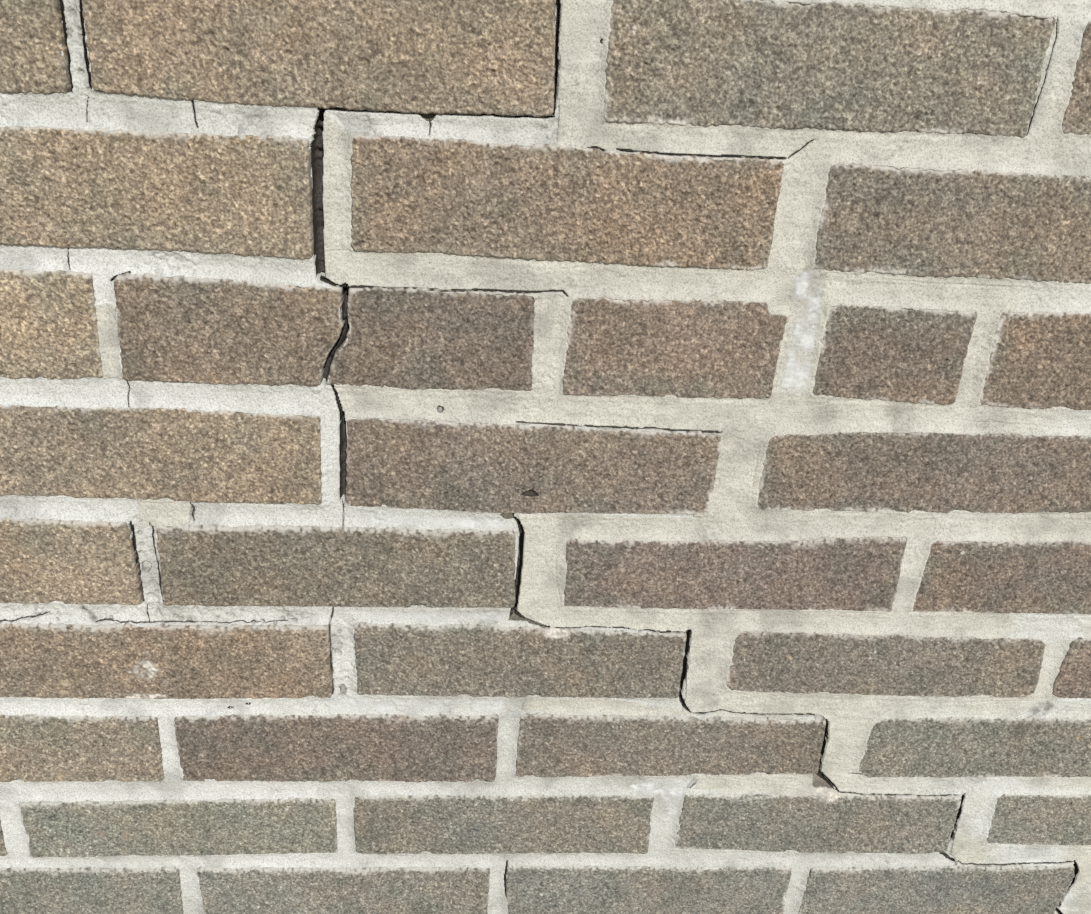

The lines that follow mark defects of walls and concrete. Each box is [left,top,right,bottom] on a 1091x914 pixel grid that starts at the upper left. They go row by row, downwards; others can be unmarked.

crack [1026,18,1058,136]
crack [592,139,814,159]
crack [311,0,568,521]
crack [516,421,722,433]
crack [0,611,50,622]
crack [95,521,295,624]
crack [327,607,335,693]
crack [514,517,1079,914]